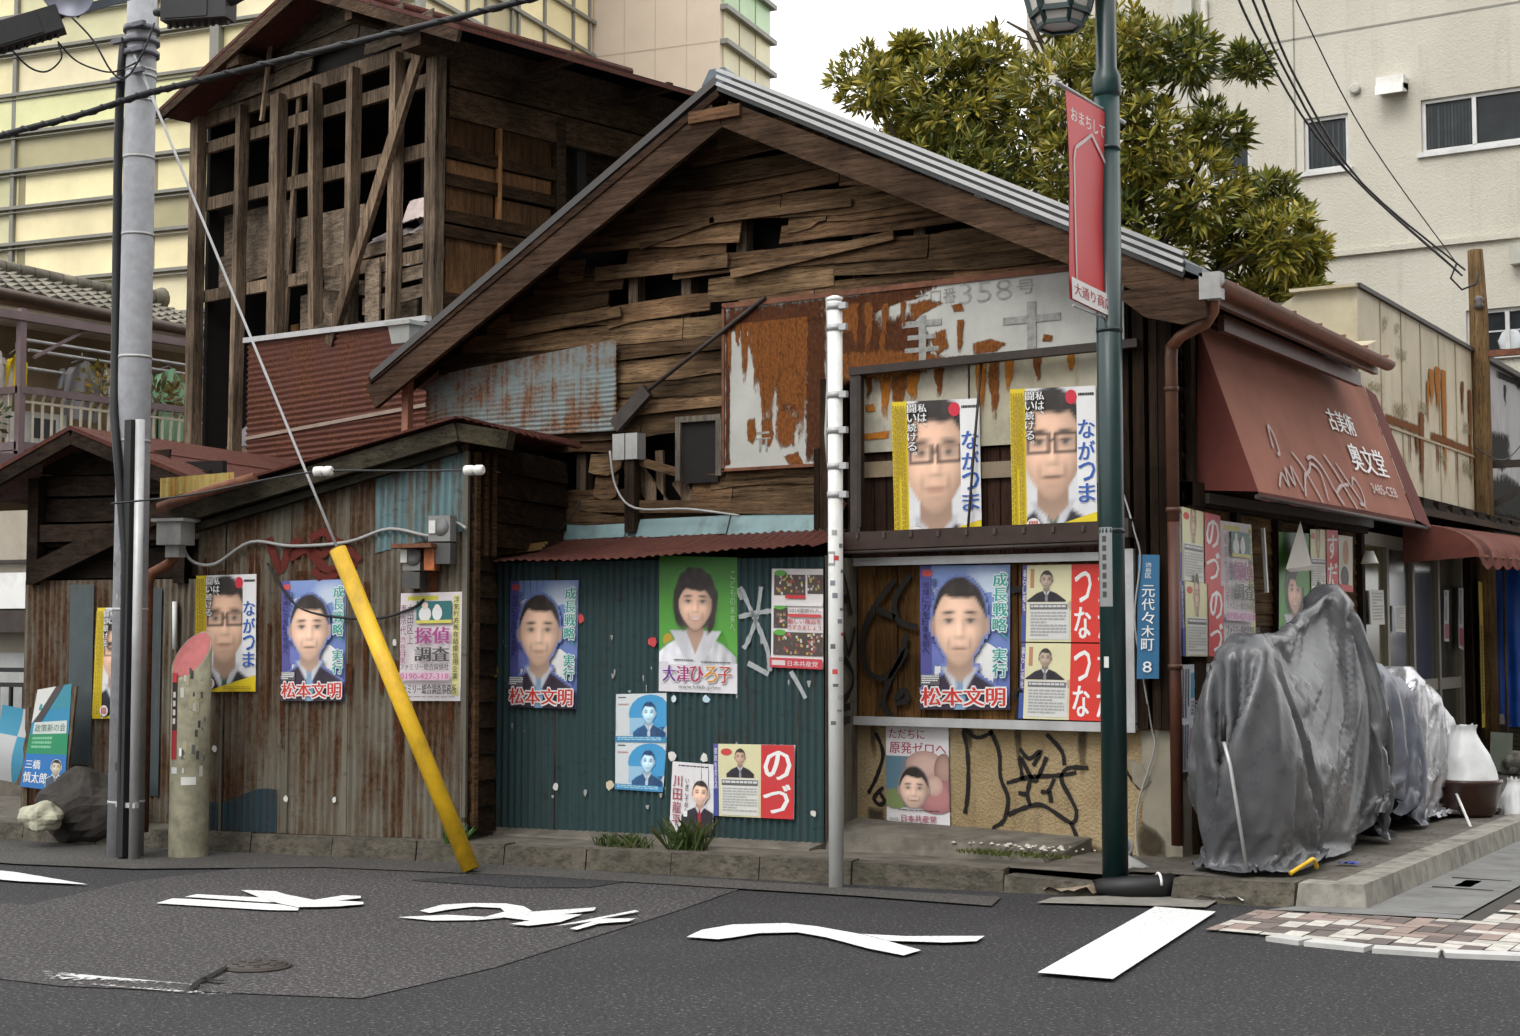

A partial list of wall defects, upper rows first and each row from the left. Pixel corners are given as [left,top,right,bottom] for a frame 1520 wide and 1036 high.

rust [864,367,944,440]
rust [975,361,1014,418]
rust [1033,358,1042,380]
rust [1385,366,1476,488]